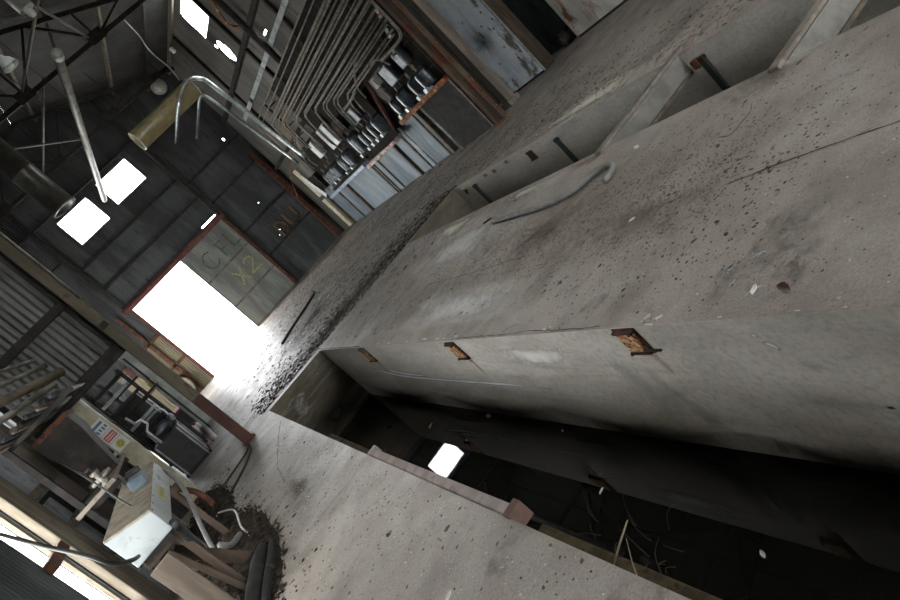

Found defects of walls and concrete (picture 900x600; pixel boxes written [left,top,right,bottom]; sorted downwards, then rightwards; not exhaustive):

crack [725,120,900,185]